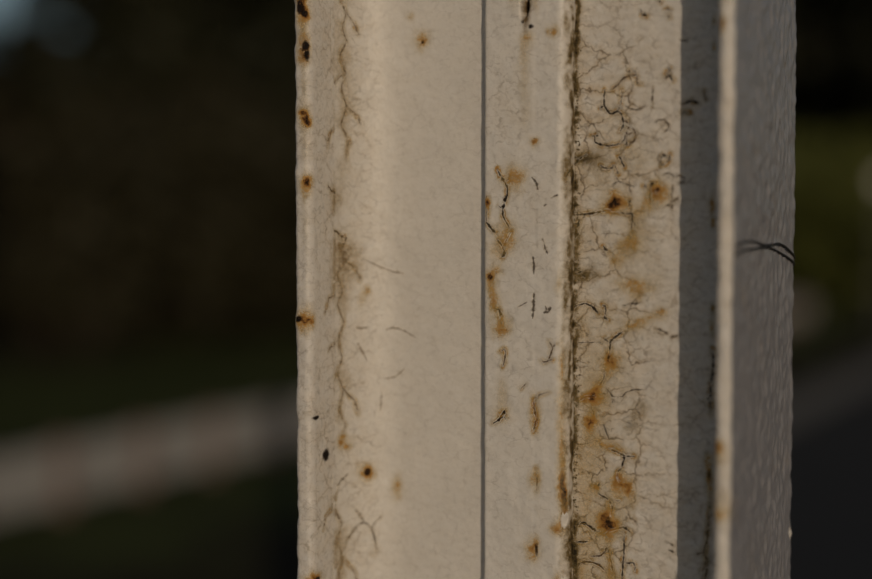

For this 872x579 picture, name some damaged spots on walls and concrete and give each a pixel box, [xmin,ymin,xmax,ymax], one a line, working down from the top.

corrosion [297,0,310,64]
corrosion [522,0,533,40]
corrosion [298,109,312,128]
crack [327,0,362,161]
crack [531,69,707,242]
crack [485,166,512,259]
corrosion [603,190,628,215]
crack [324,229,416,436]
crack [493,238,552,369]
corrosion [360,464,373,479]
crack [573,301,646,579]
corrosion [596,505,620,579]